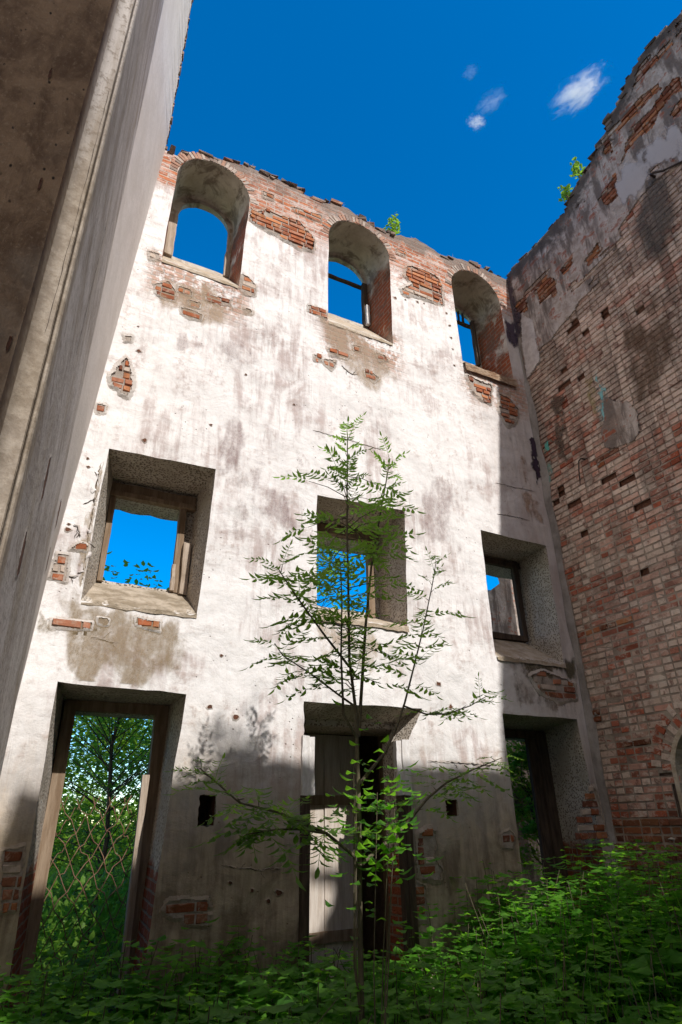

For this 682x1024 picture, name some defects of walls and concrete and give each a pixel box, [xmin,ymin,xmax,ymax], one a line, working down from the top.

leakage [616,125,682,256]
spalling [152,274,259,323]
spalling [106,325,142,401]
spalling [312,344,363,372]
spalling [363,352,389,384]
spalling [453,364,520,429]
leakage [624,319,672,401]
spalling [45,495,89,584]
spalling [47,615,112,632]
leakage [68,602,177,684]
spalling [527,668,579,707]
spalling [0,842,27,916]